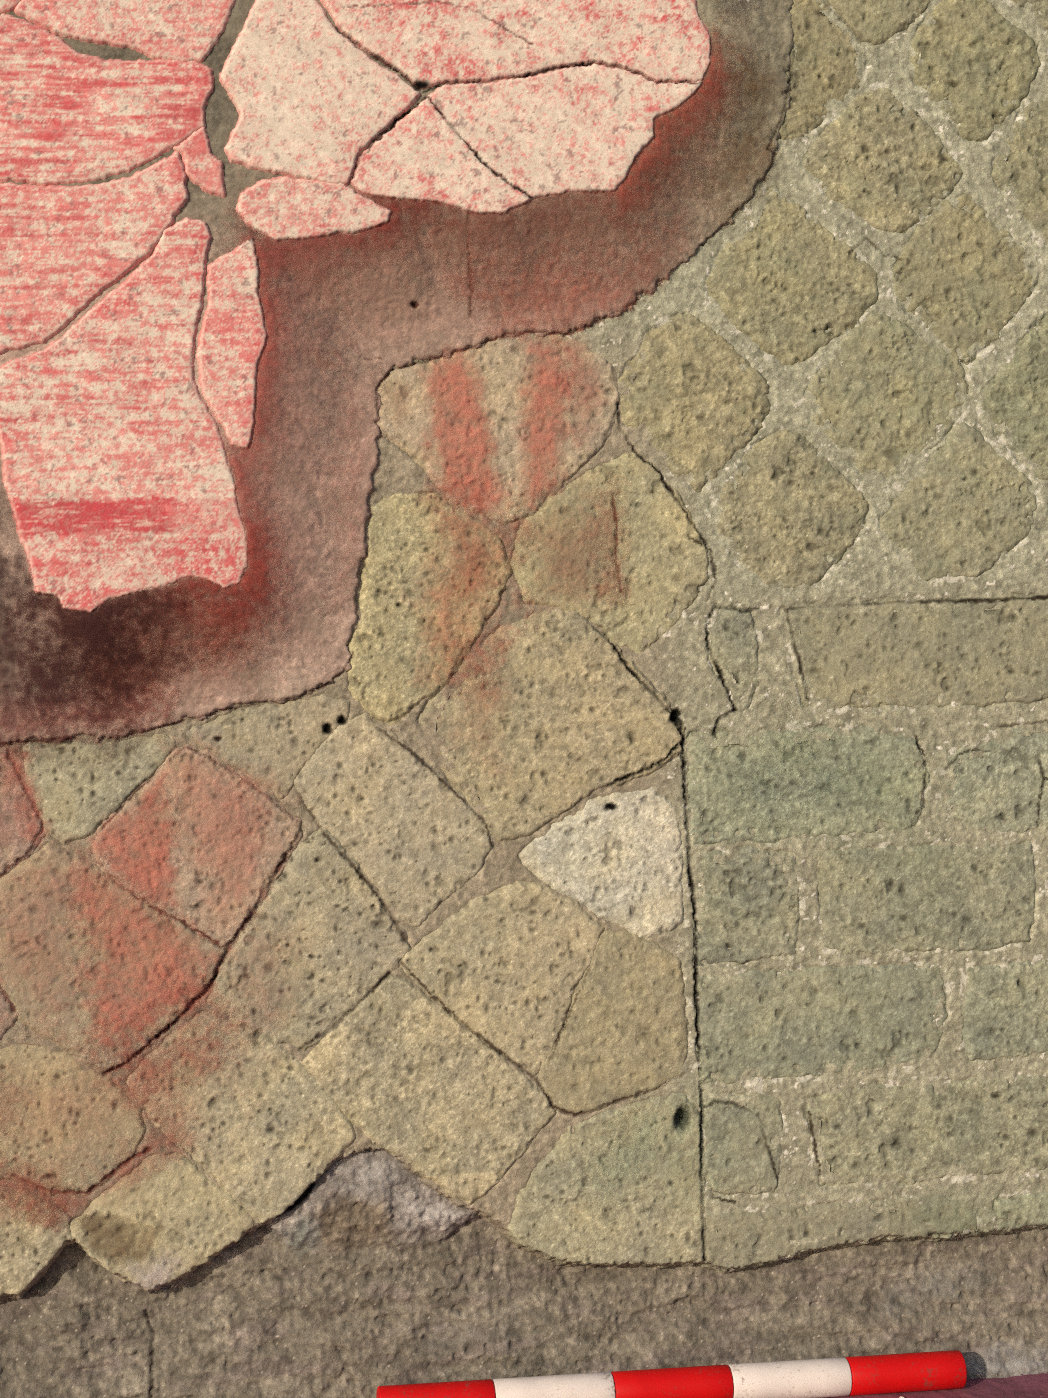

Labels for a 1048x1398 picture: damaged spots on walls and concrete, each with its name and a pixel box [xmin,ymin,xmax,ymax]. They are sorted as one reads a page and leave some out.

damp [619,57,714,199]
damp [0,201,400,731]
flaking render [0,0,794,745]
damp [428,361,501,509]
damp [527,346,568,496]
crack [921,595,1048,604]
crack [795,648,809,700]
crack [608,404,759,1203]
crack [915,720,1048,823]
spalling [265,1149,480,1256]
crack [808,1111,820,1175]
crack [144,1310,153,1397]